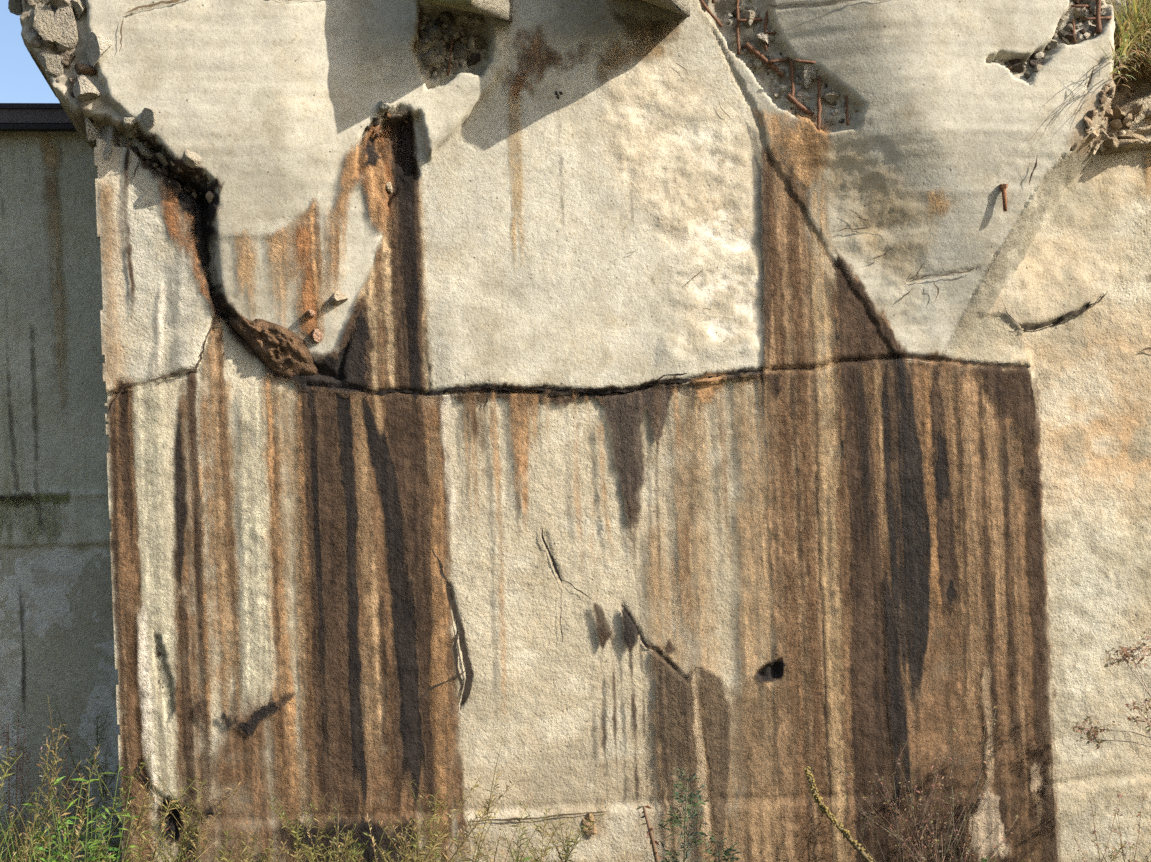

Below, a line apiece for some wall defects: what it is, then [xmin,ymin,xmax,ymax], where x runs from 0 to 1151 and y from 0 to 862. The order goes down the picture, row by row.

spalling [8,0,112,101]
crack [119,0,180,52]
spalling [419,11,486,78]
spalling [724,0,860,125]
spalling [994,0,1106,80]
spalling [85,108,215,206]
crack [1004,291,1108,330]
crack [109,316,216,417]
water stain [101,130,768,862]
crack [541,527,591,642]
water stain [830,250,1061,862]
crack [639,633,665,650]